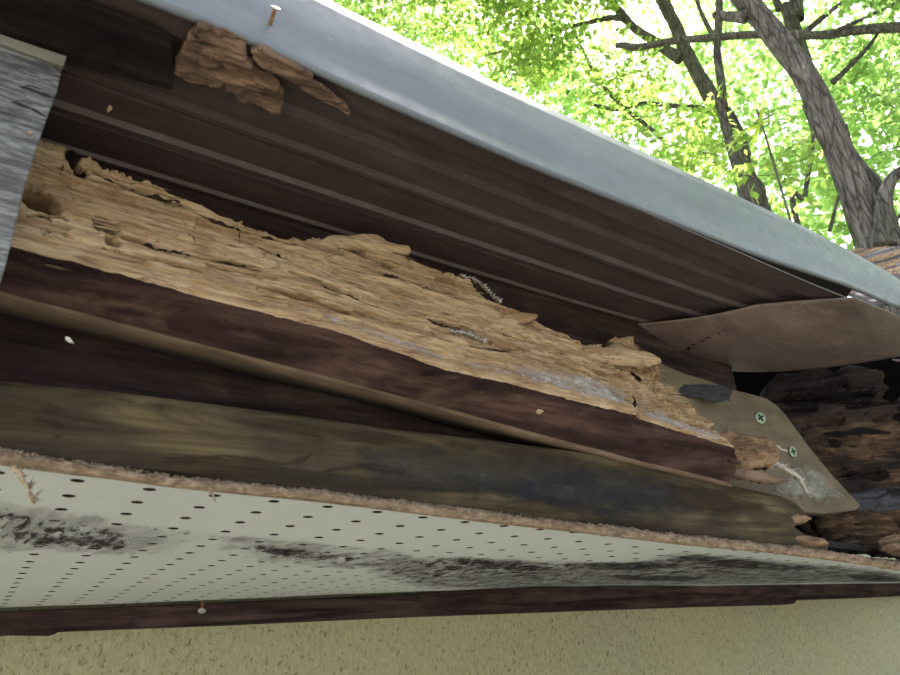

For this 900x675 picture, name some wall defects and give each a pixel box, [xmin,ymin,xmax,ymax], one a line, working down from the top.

spalling [65,150,86,179]
peeling [508,367,628,403]
peeling [645,409,719,439]
damp [824,427,891,437]
damp [776,468,900,512]
damp [0,510,145,550]
peeling [791,514,812,525]
peeling [796,536,829,548]
damp [257,541,900,589]